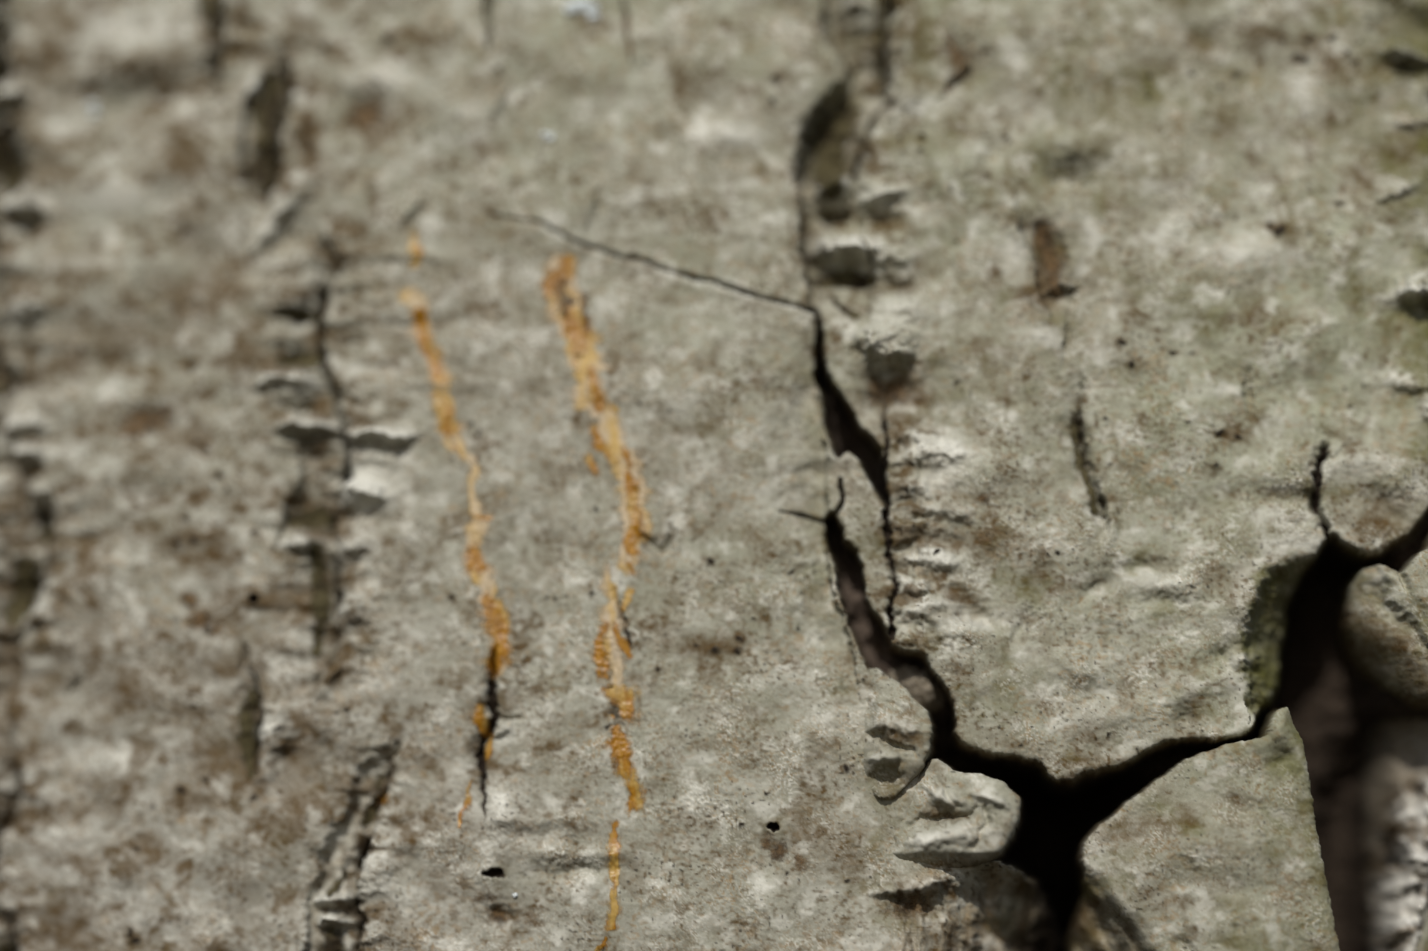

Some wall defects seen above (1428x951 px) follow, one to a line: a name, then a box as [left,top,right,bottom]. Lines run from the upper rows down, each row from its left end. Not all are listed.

crack [275,289,353,662]
crack [474,676,499,820]
crack [618,601,632,647]
crack [779,363,1197,950]
crack [1275,445,1428,951]